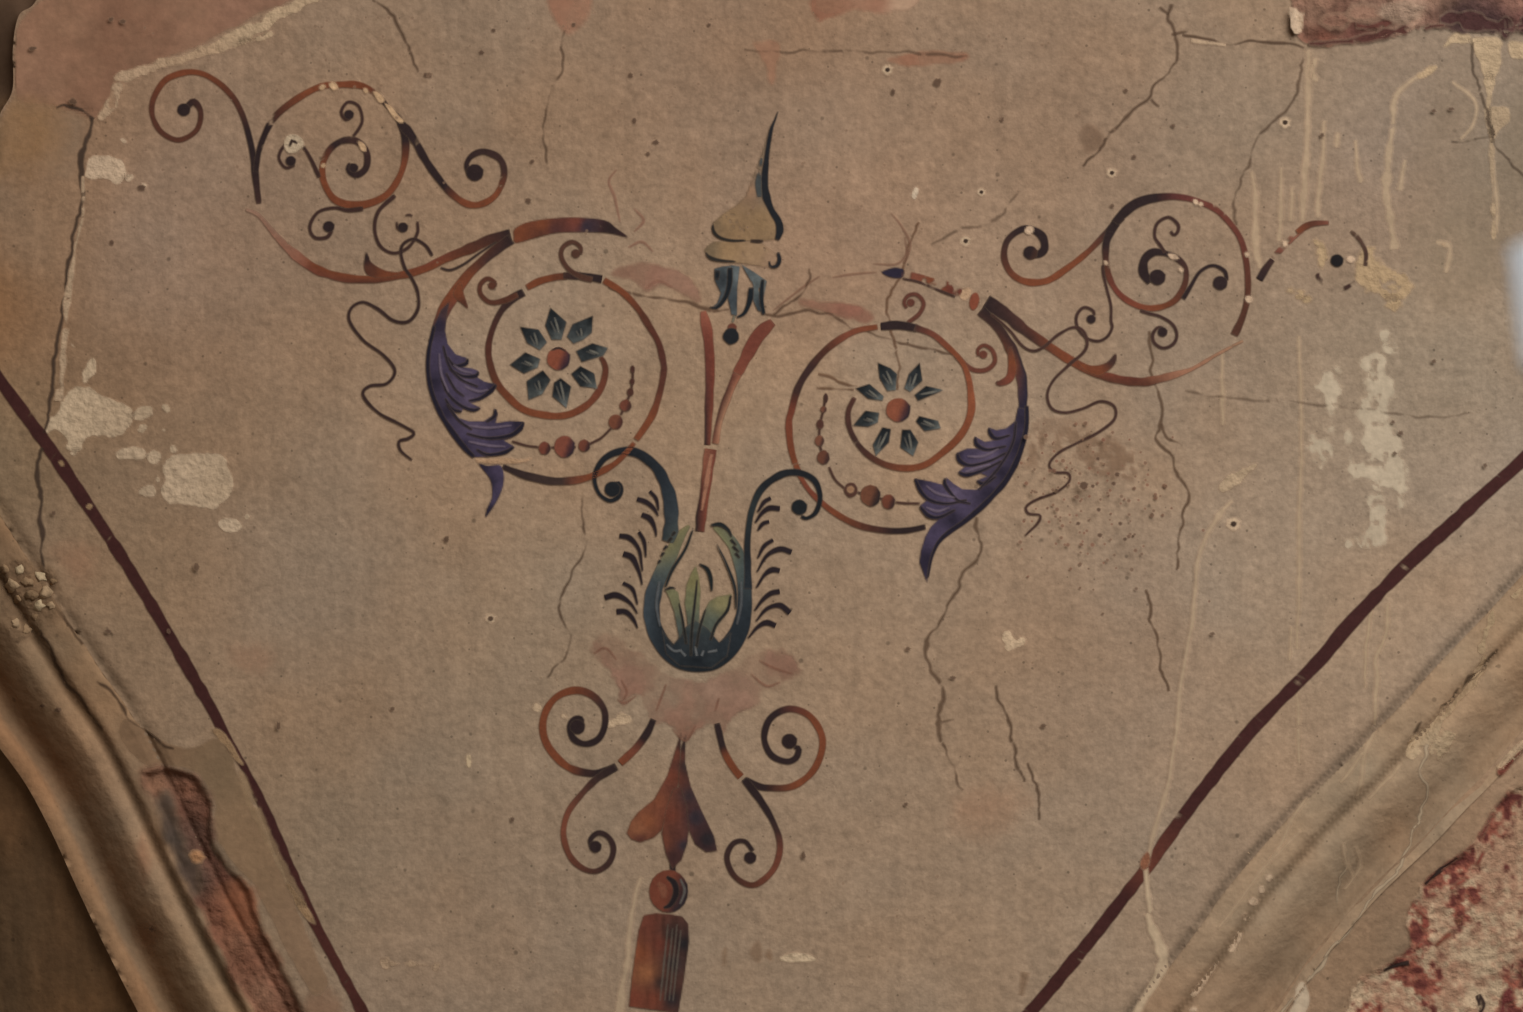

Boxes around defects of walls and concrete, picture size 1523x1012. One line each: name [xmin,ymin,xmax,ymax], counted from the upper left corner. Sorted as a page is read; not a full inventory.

crack [1084,5,1302,165]
crack [1472,43,1523,175]
crack [35,104,94,569]
crack [609,287,720,311]
crack [766,222,950,390]
flaking render [45,358,250,533]
crack [924,518,982,783]
crack [996,687,1040,819]
flaking render [1346,740,1523,1012]